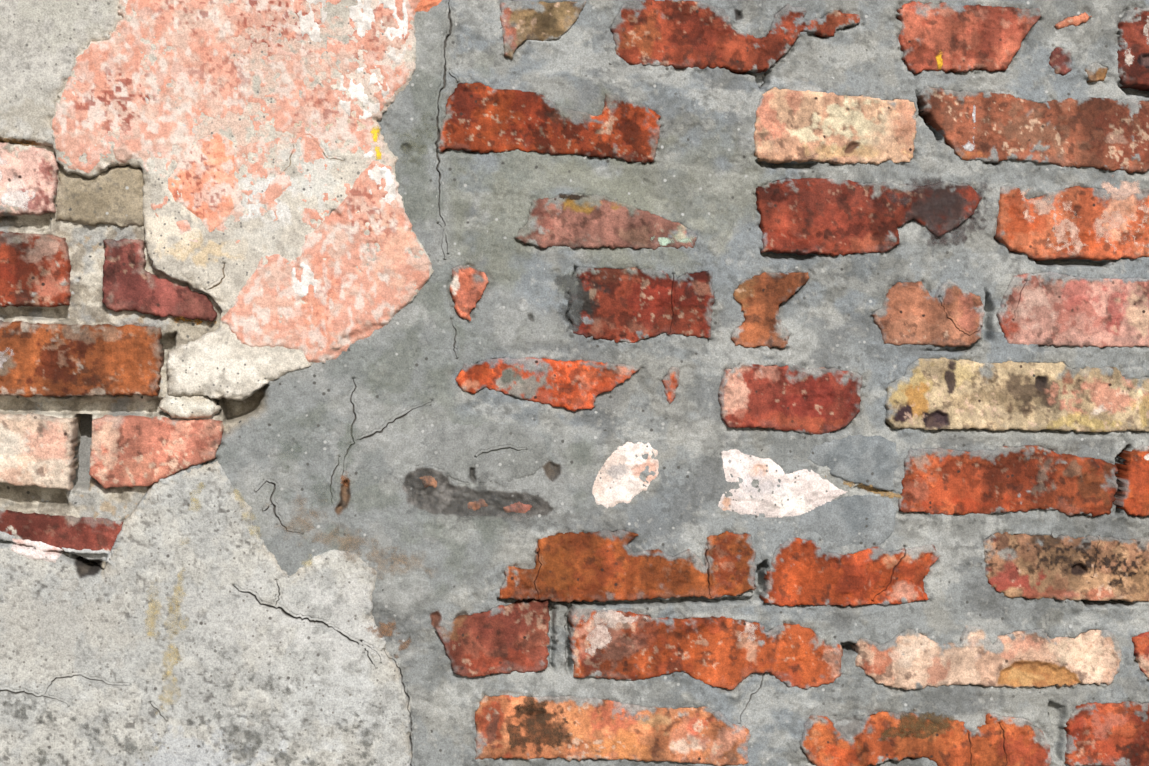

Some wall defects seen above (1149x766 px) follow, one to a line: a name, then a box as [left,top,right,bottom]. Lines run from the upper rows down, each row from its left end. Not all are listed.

peeling [52,0,442,363]
crack [432,0,459,259]
flaking render [0,531,111,563]
crack [255,478,303,536]
crack [327,378,434,511]
crack [0,673,168,723]
crack [233,580,415,766]